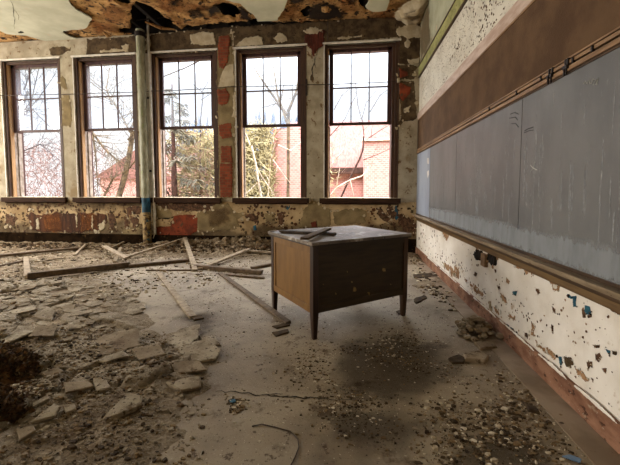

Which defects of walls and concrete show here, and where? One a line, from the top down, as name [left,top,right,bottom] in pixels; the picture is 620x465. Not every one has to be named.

spalling [395,0,510,130]
peeling [0,203,142,234]
flaking render [152,25,617,423]
crack [219,390,352,400]